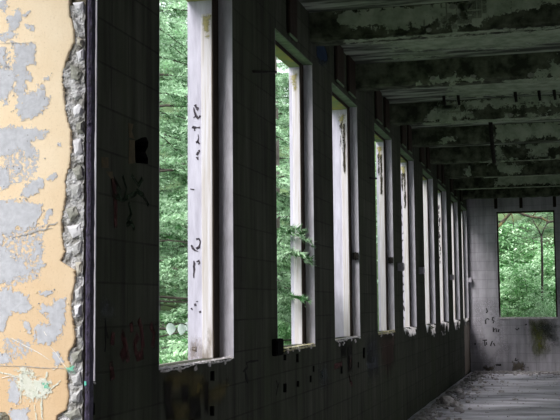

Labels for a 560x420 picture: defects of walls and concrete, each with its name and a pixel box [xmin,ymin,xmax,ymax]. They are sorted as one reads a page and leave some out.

peeling [334,0,560,61]
spalling [0,0,86,420]
spalling [128,123,148,164]
peeling [405,53,560,190]